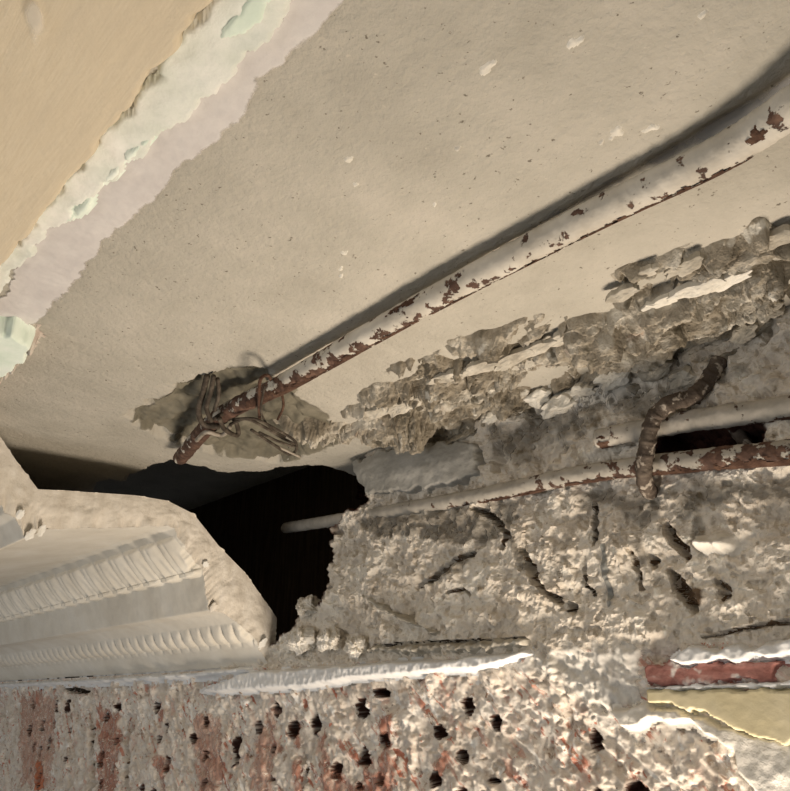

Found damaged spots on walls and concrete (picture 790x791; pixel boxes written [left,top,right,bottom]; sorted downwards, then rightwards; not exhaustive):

flaking render [0,0,343,356]
corrosion [745,125,768,146]
corrosion [429,156,754,315]
corrosion [245,321,419,409]
corrosion [385,294,418,317]
spalling [272,217,790,455]
corrosion [596,435,612,449]
corrosion [652,453,790,476]
spalling [96,703,122,791]
spalling [318,732,397,791]
spalling [378,715,391,735]
peeling [645,639,790,746]